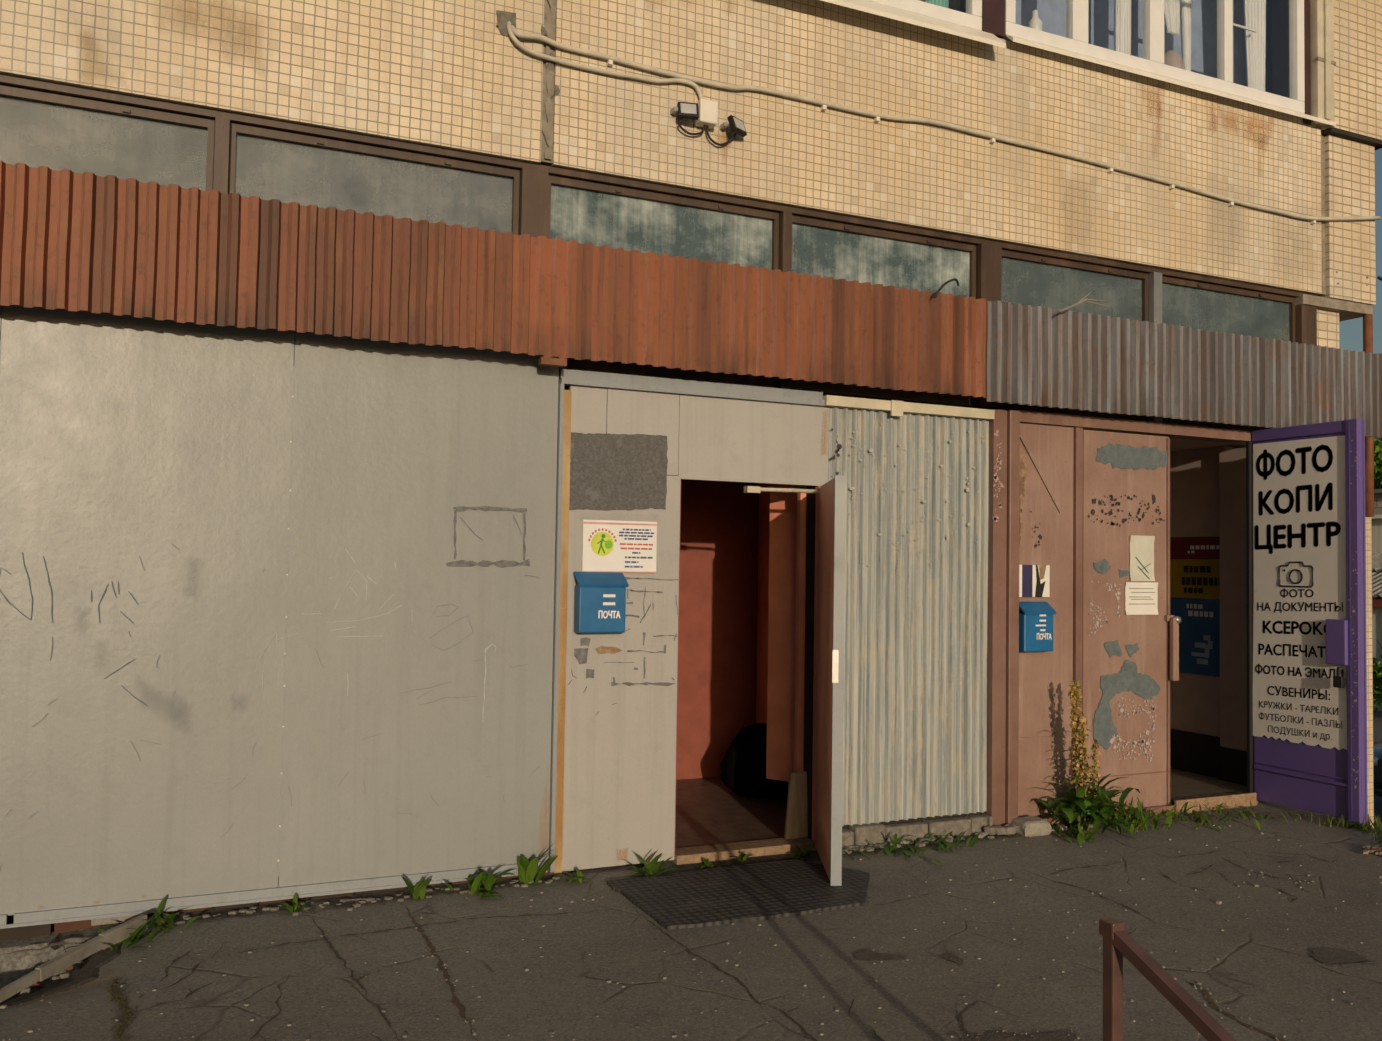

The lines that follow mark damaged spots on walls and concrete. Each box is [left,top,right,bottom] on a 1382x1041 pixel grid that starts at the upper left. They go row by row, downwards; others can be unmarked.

spalling [1088,494,1165,526]
peeling [1089,559,1160,761]
crack [1028,862,1157,957]
crack [1153,848,1335,903]
crack [130,907,817,1041]
crack [1164,968,1285,1041]